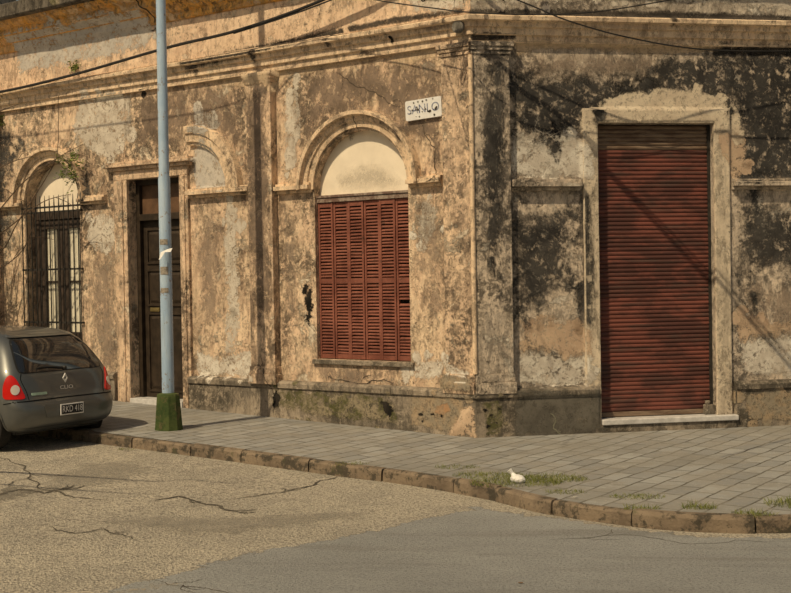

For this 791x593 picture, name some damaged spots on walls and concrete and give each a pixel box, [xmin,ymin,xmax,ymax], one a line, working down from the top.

flaking render [4,6,156,73]
leakage [0,130,25,277]
leakage [478,42,791,338]
flaking render [515,315,600,387]
peeling [731,305,791,377]
spalling [730,387,791,427]
crack [0,457,106,500]
crack [153,477,336,514]
crack [53,527,133,539]